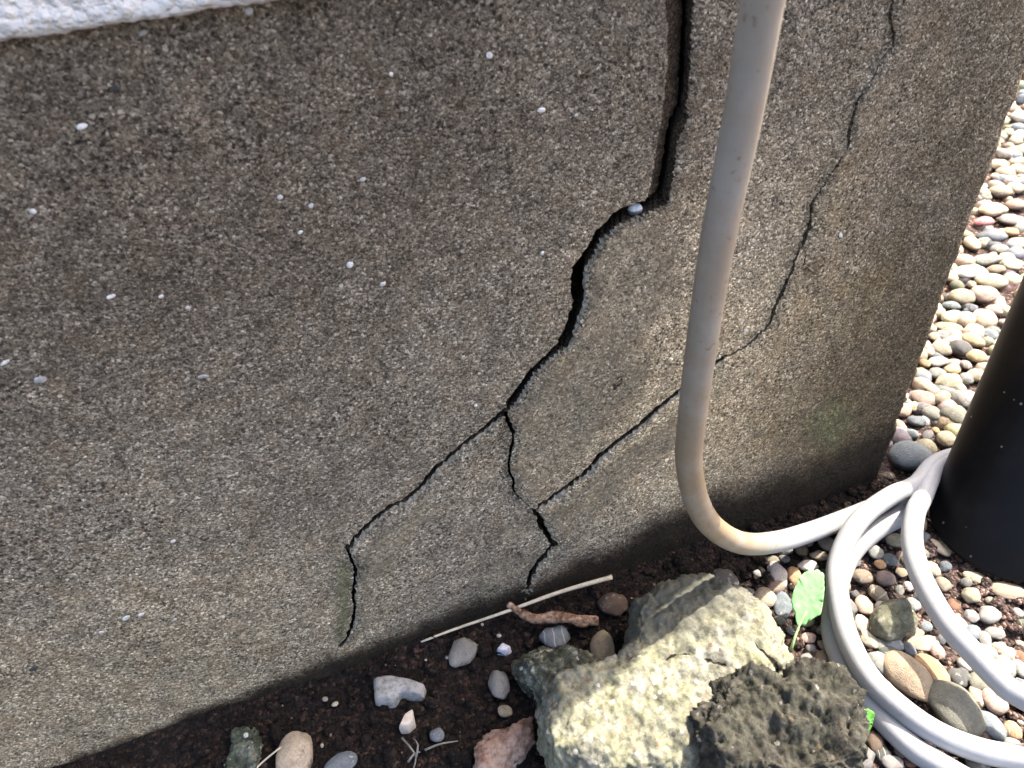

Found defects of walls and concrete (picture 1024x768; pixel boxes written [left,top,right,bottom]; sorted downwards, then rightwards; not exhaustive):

crack [338,0,695,648]
crack [715,0,896,365]